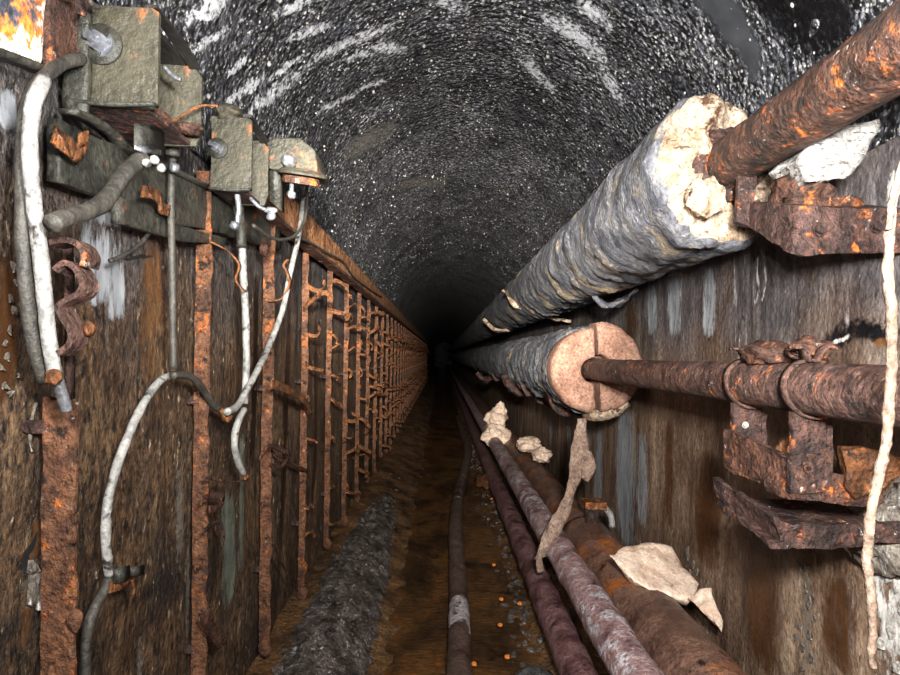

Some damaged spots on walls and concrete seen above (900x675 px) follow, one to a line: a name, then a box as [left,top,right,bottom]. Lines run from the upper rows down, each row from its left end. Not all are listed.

rust [665,424,673,524]
rust [695,456,719,566]
rust [748,536,776,674]
rust [823,583,854,672]